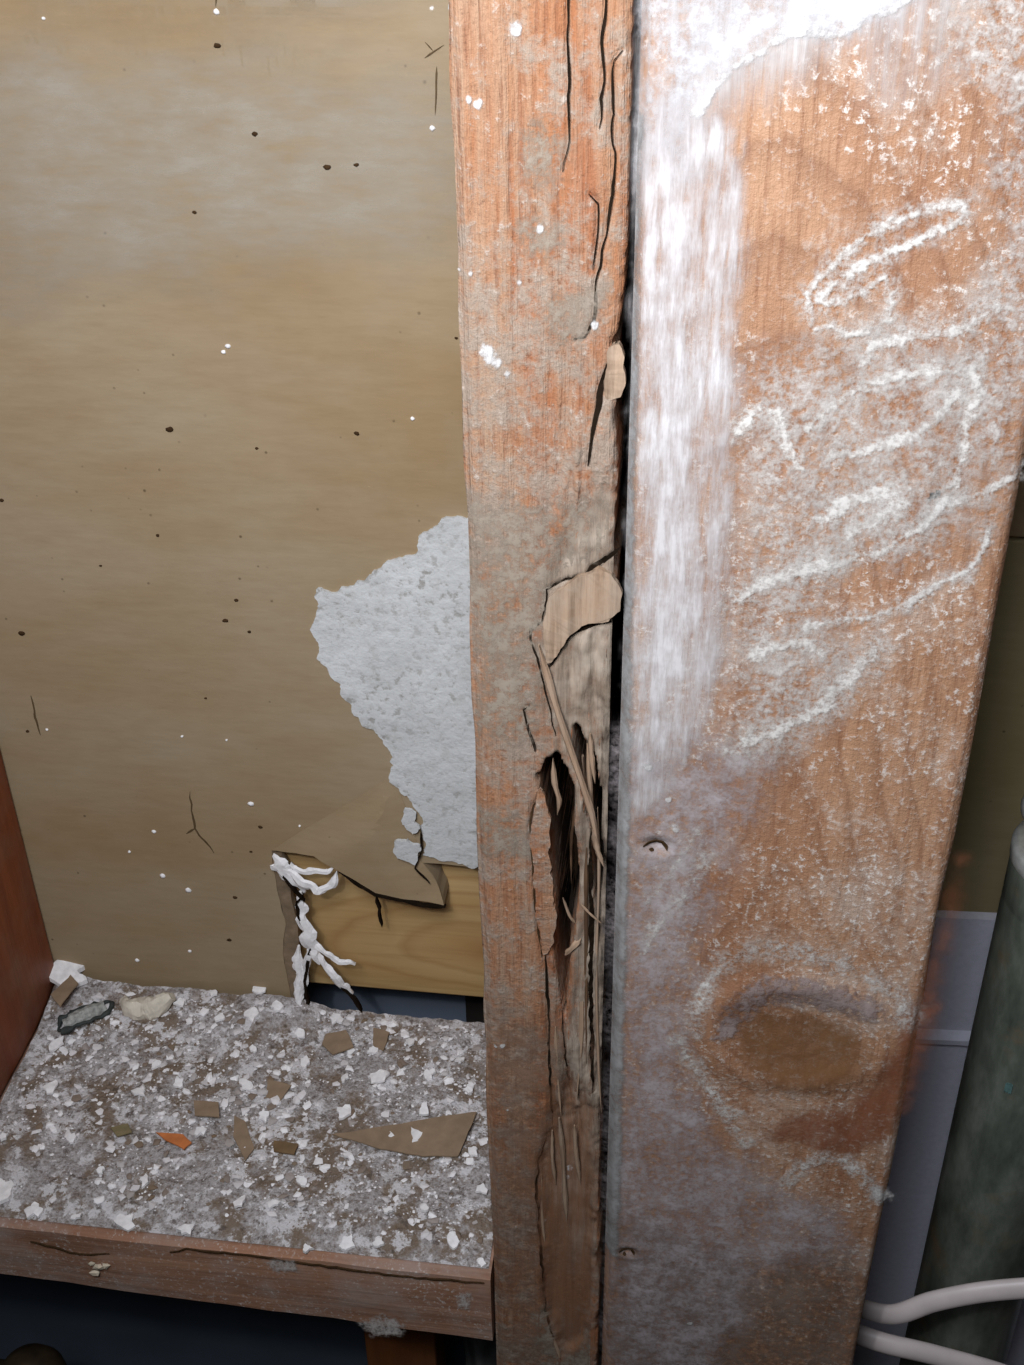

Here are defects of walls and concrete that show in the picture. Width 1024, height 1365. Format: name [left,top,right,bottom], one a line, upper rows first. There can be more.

crack [562,0,623,466]
leakage [628,0,1017,813]
flaking render [310,515,478,869]
crack [414,831,430,884]
crack [523,546,621,751]
crack [529,788,595,1360]
leakage [668,957,752,1147]
leakage [744,942,936,1202]